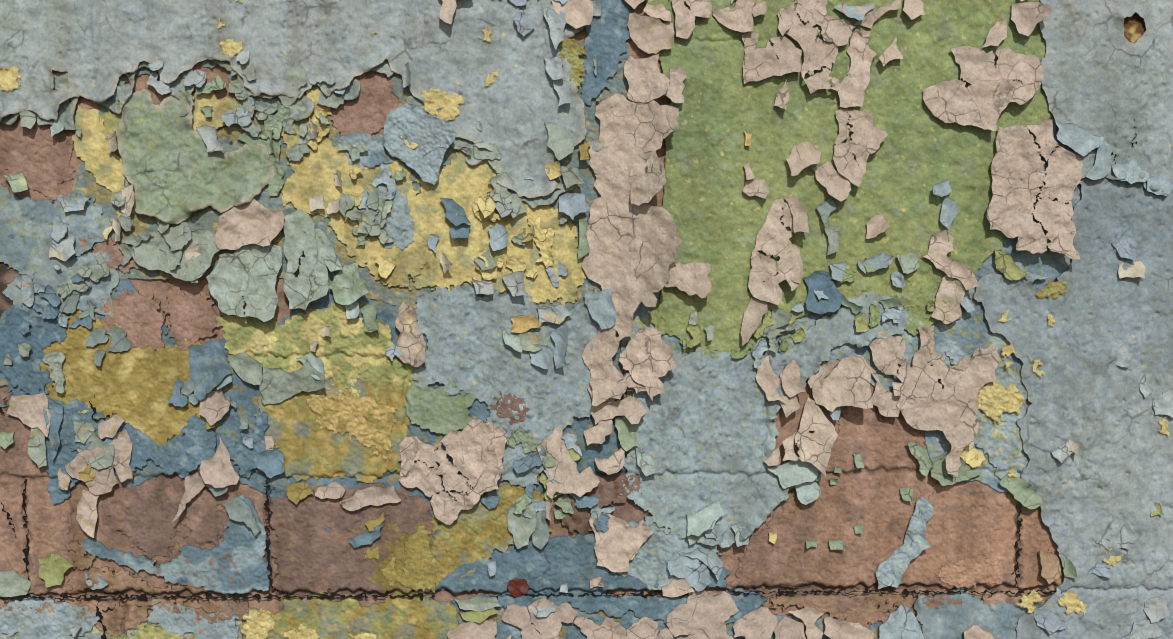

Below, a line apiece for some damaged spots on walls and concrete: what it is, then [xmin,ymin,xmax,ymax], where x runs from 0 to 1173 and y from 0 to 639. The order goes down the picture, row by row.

peeling [923,0,1173,280]
peeling [0,0,924,639]
spalling [447,161,1113,639]
peeling [1139,374,1173,418]
peeling [1122,593,1170,639]